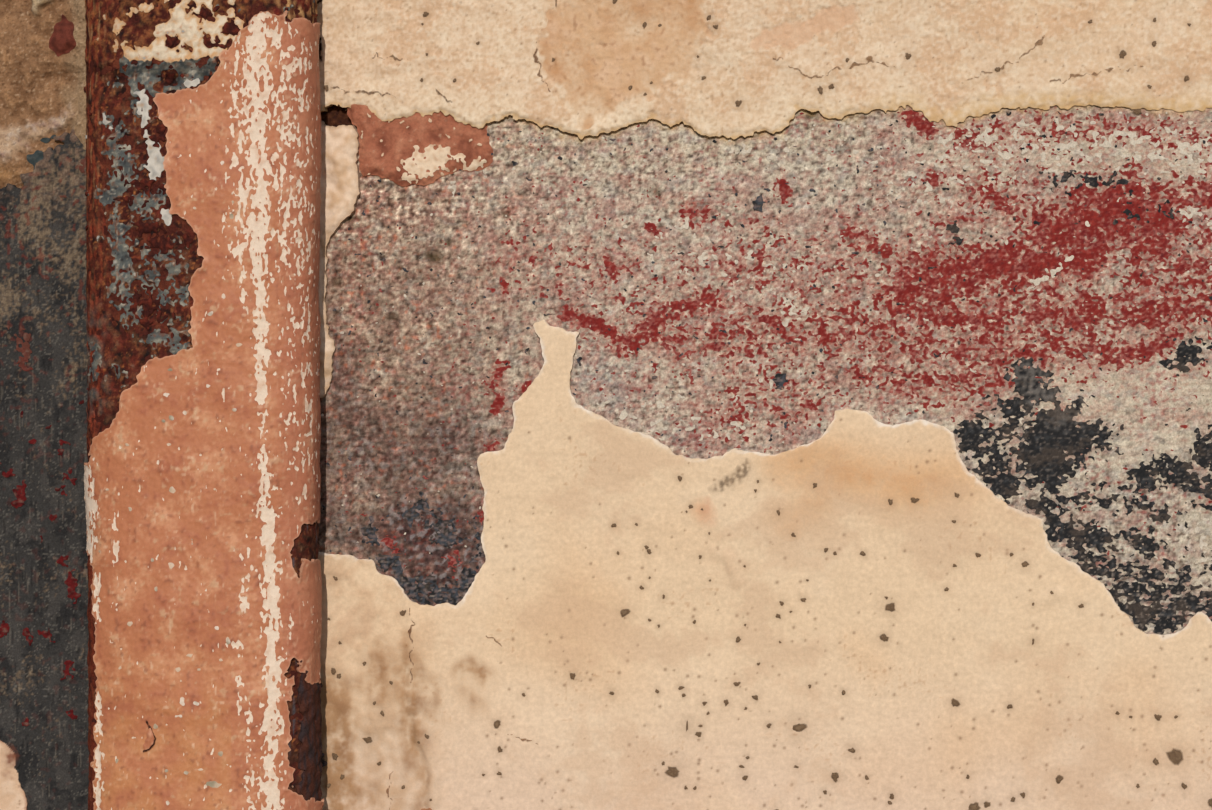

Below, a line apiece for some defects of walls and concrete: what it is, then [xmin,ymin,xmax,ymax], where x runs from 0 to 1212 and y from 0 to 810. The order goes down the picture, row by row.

peeling [0,0,136,810]
rust [84,0,318,462]
peeling [189,781,232,801]
peeling [186,626,244,661]
peeling [220,12,321,810]
rust [290,521,319,578]
rust [284,658,327,802]
peeling [273,0,1212,635]